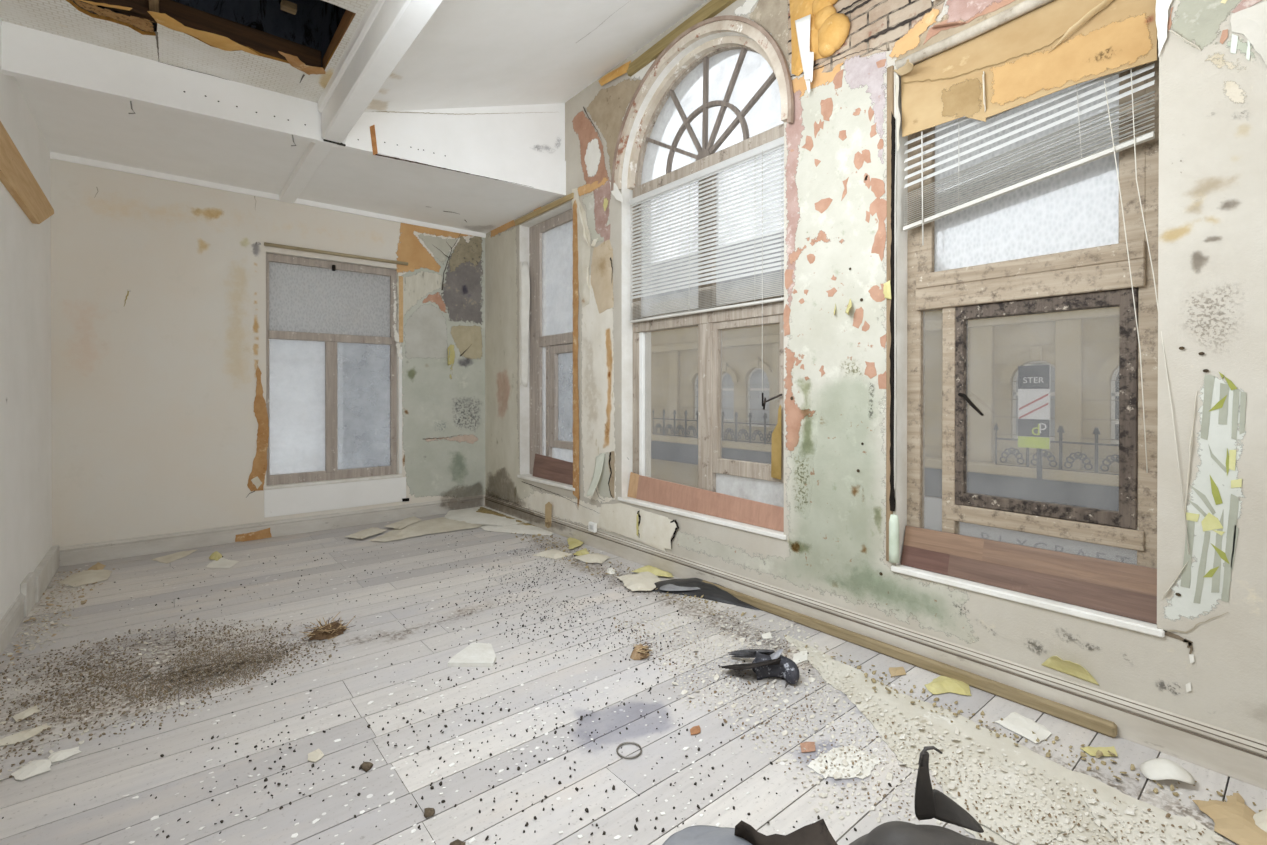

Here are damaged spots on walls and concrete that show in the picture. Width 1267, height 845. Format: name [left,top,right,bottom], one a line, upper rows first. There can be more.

flaking render [1167,0,1262,51]
flaking render [572,60,641,243]
peeling [247,362,269,491]
flaking render [401,227,534,503]
spalling [586,451,615,501]
crack [636,511,679,549]
flaking render [676,0,1025,644]
crack [1158,612,1228,654]